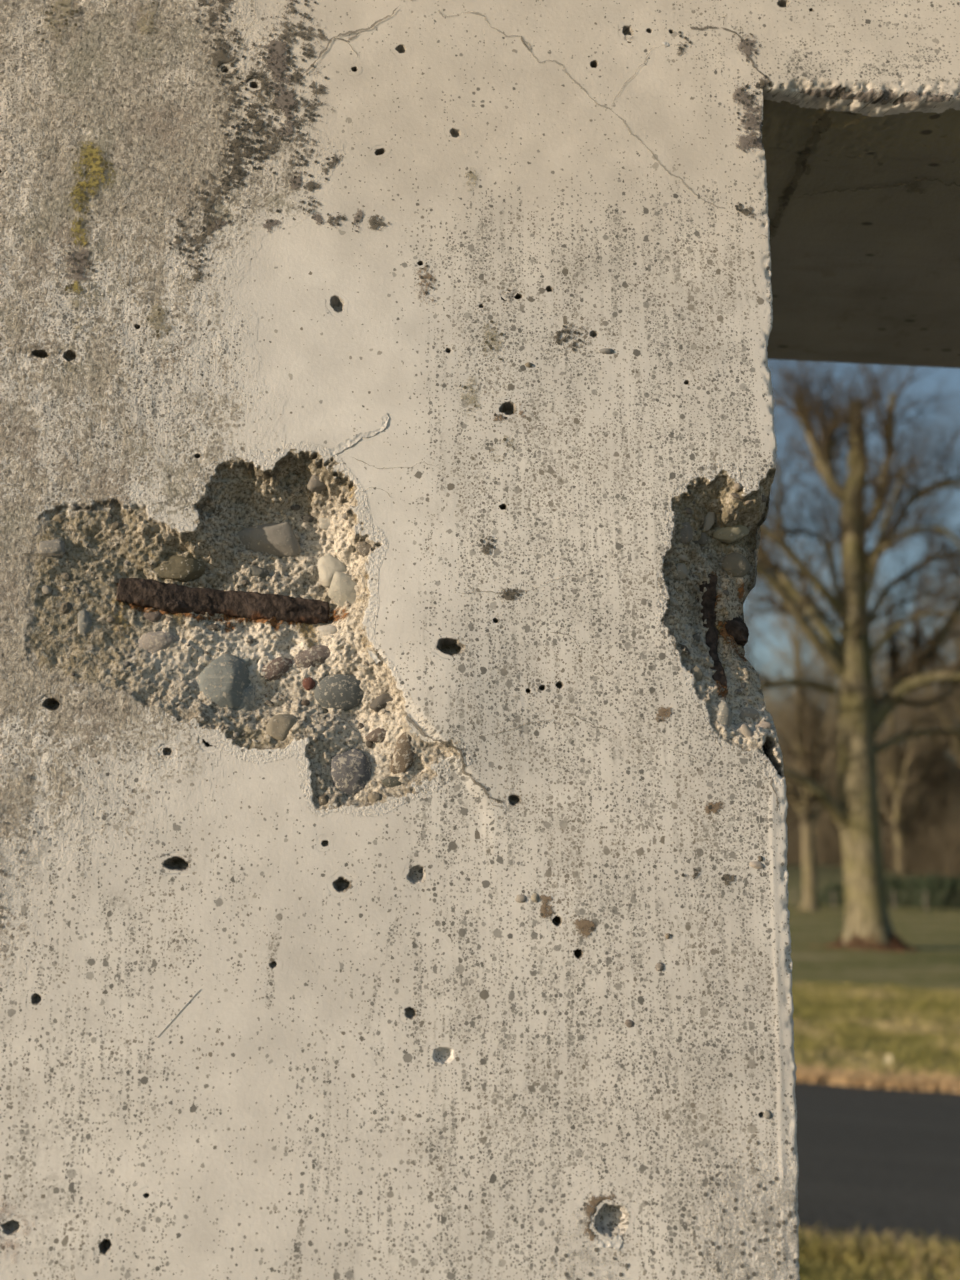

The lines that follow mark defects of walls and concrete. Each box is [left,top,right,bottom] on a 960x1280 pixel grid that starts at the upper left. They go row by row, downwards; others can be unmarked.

crack [302,6,399,75]
leakage [0,0,390,984]
corrosion [112,583,315,648]
spalling [11,413,472,817]
corrosion [329,608,348,622]
spalling [655,460,786,789]
corrosion [715,680,728,700]